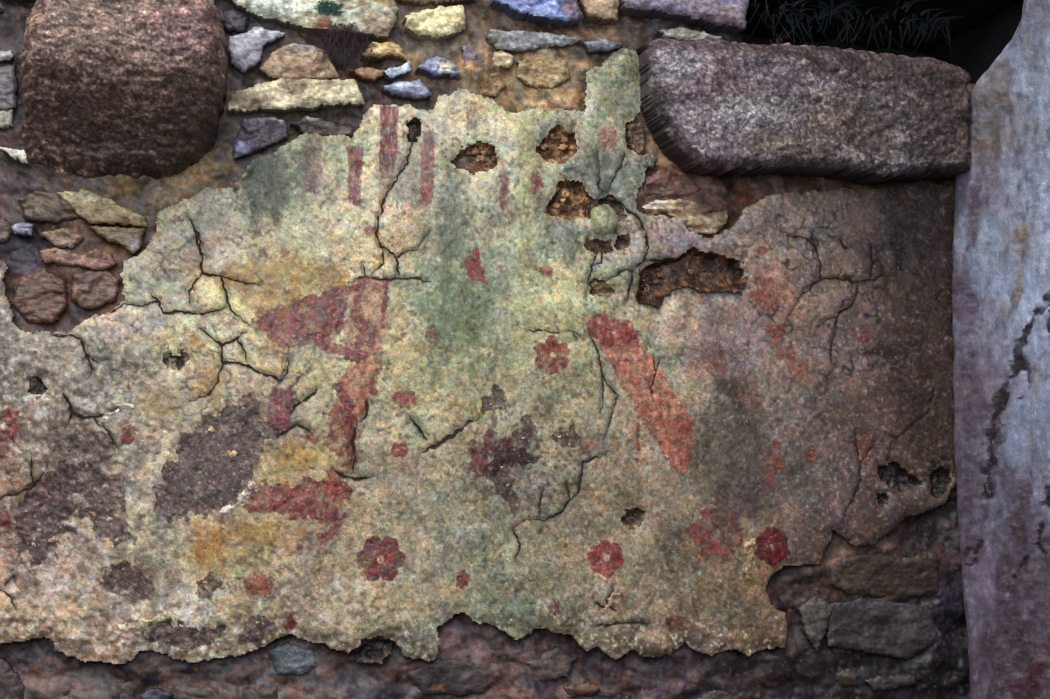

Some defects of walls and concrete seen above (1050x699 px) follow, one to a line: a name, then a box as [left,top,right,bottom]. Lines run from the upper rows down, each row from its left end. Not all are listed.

crack [350,125,431,283]
spalling [450,141,499,175]
spalling [533,125,626,221]
spalling [584,233,630,254]
crack [110,215,289,402]
spalling [588,279,615,298]
spalling [636,245,748,308]
crack [787,235,883,365]
crack [279,388,317,436]
crack [512,329,619,561]
spalling [875,461,951,508]
spalling [355,636,392,664]